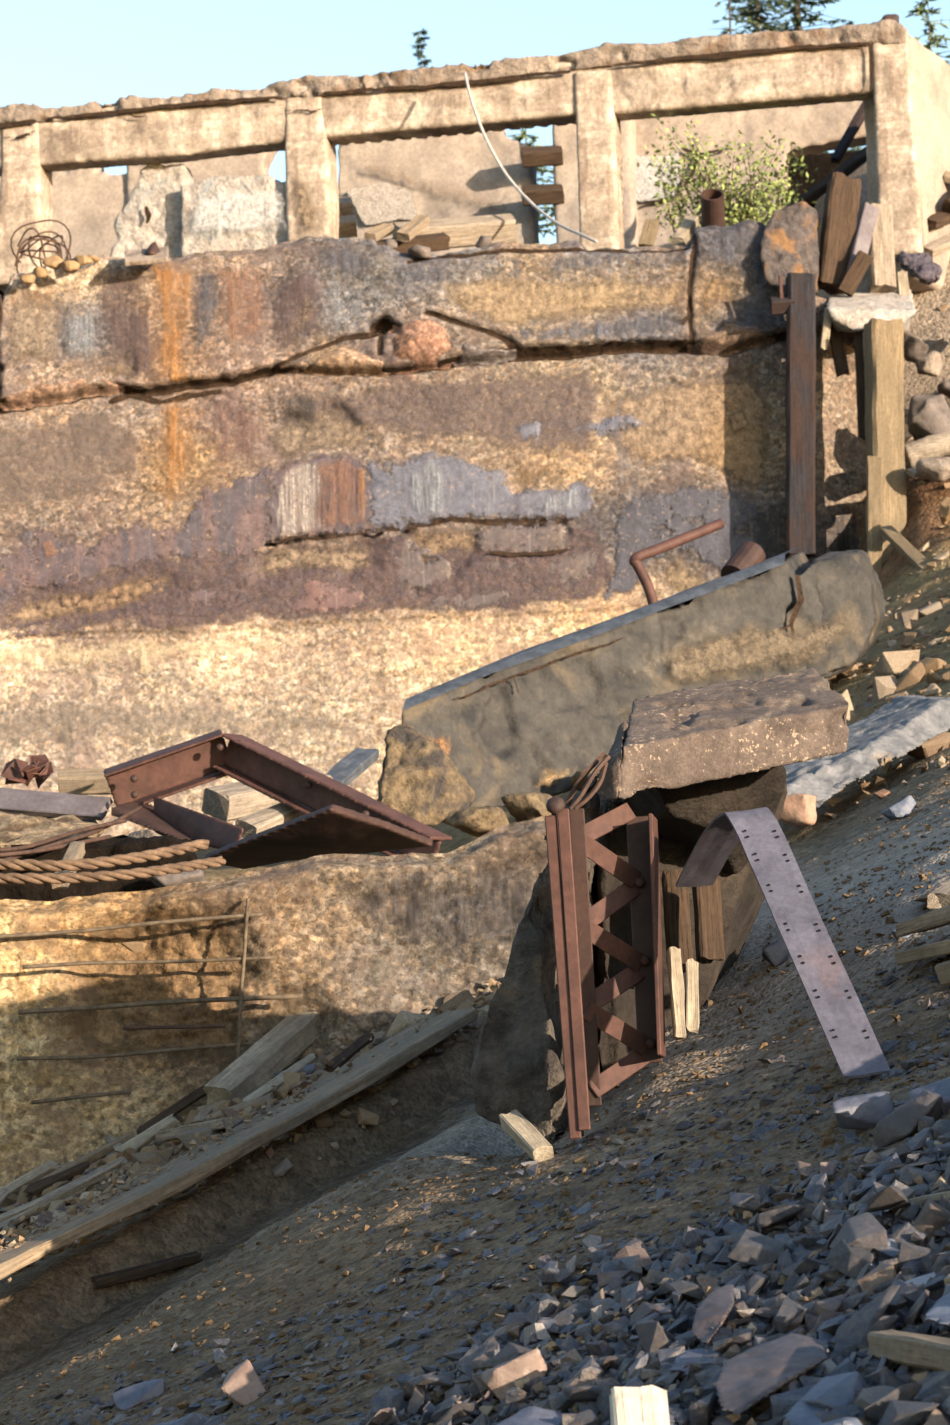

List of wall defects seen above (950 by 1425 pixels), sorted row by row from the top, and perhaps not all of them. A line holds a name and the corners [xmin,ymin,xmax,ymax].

rust [155,266,190,381]
crack [0,234,786,414]
peeling [0,380,773,641]